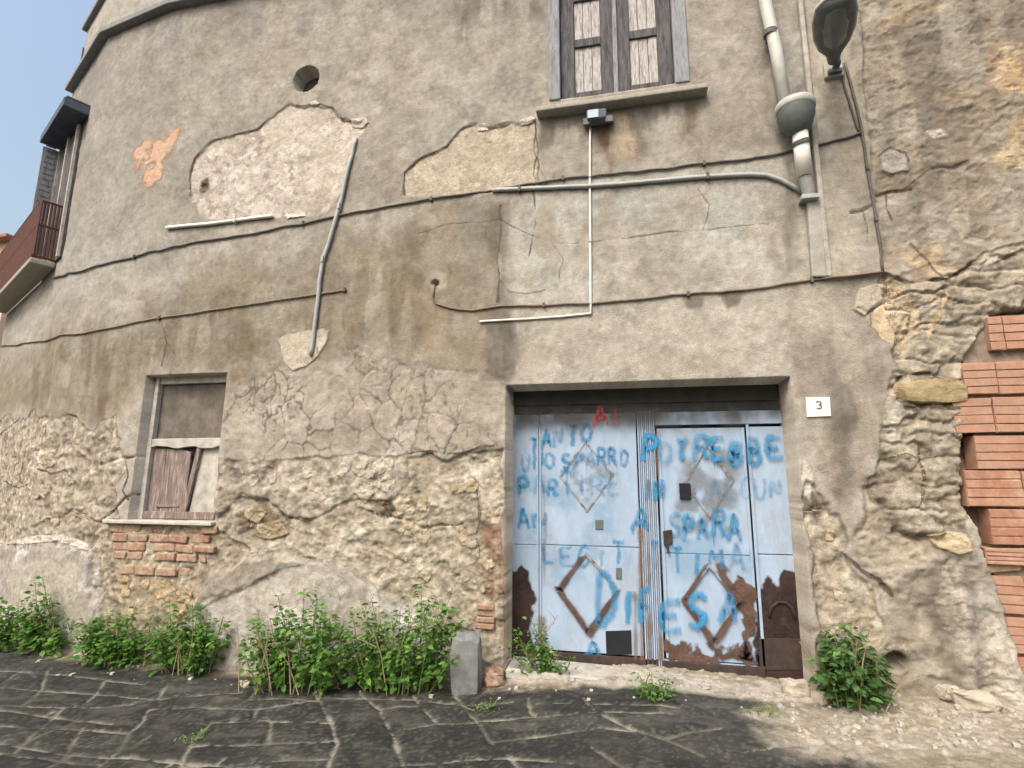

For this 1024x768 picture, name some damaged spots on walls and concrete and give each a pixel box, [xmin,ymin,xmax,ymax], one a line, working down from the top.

peeling [132,128,180,188]
spalling [189,100,368,220]
spalling [402,116,539,197]
crack [425,129,540,303]
crack [850,146,969,232]
crack [882,205,1024,285]
peeling [316,331,327,353]
spalling [854,276,949,347]
peeling [885,401,904,444]
spalling [0,409,505,678]
spalling [801,460,894,671]
peeling [926,531,974,555]